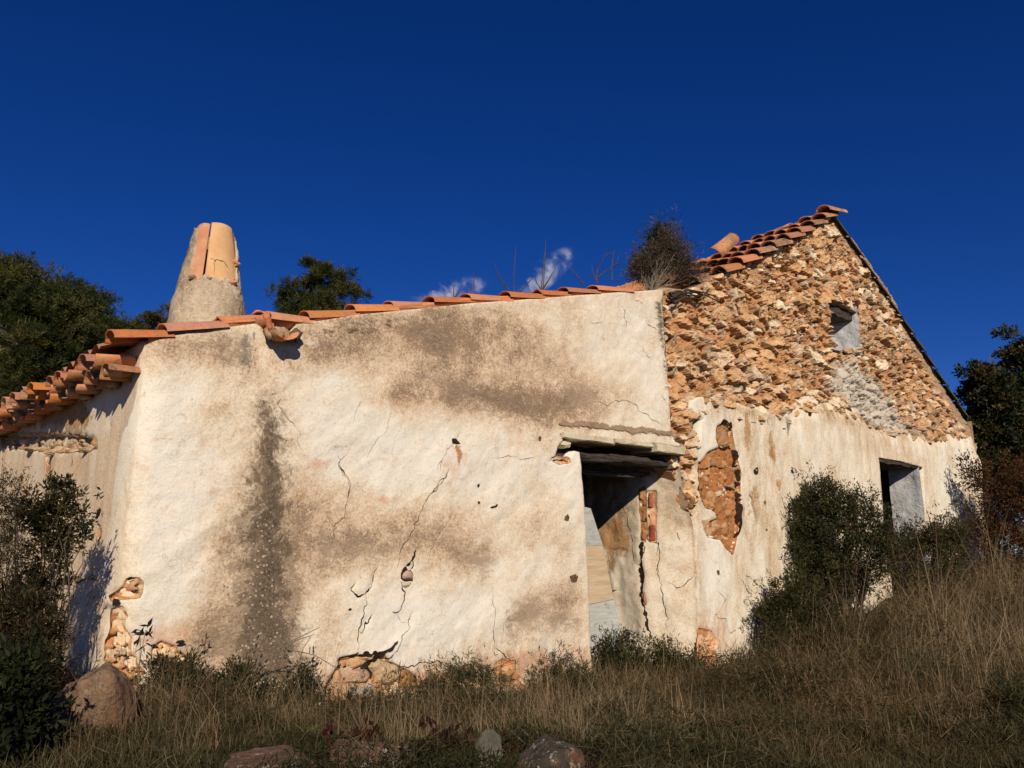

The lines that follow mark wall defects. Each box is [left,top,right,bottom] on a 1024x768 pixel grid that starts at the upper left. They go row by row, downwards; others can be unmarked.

spalling [638,216,977,555]
spalling [0,431,98,474]
water stain [208,393,309,693]
crack [333,430,387,549]
crack [351,447,452,668]
crack [612,498,692,638]
spalling [104,577,188,690]
spalling [322,641,417,706]
spalling [693,628,717,668]